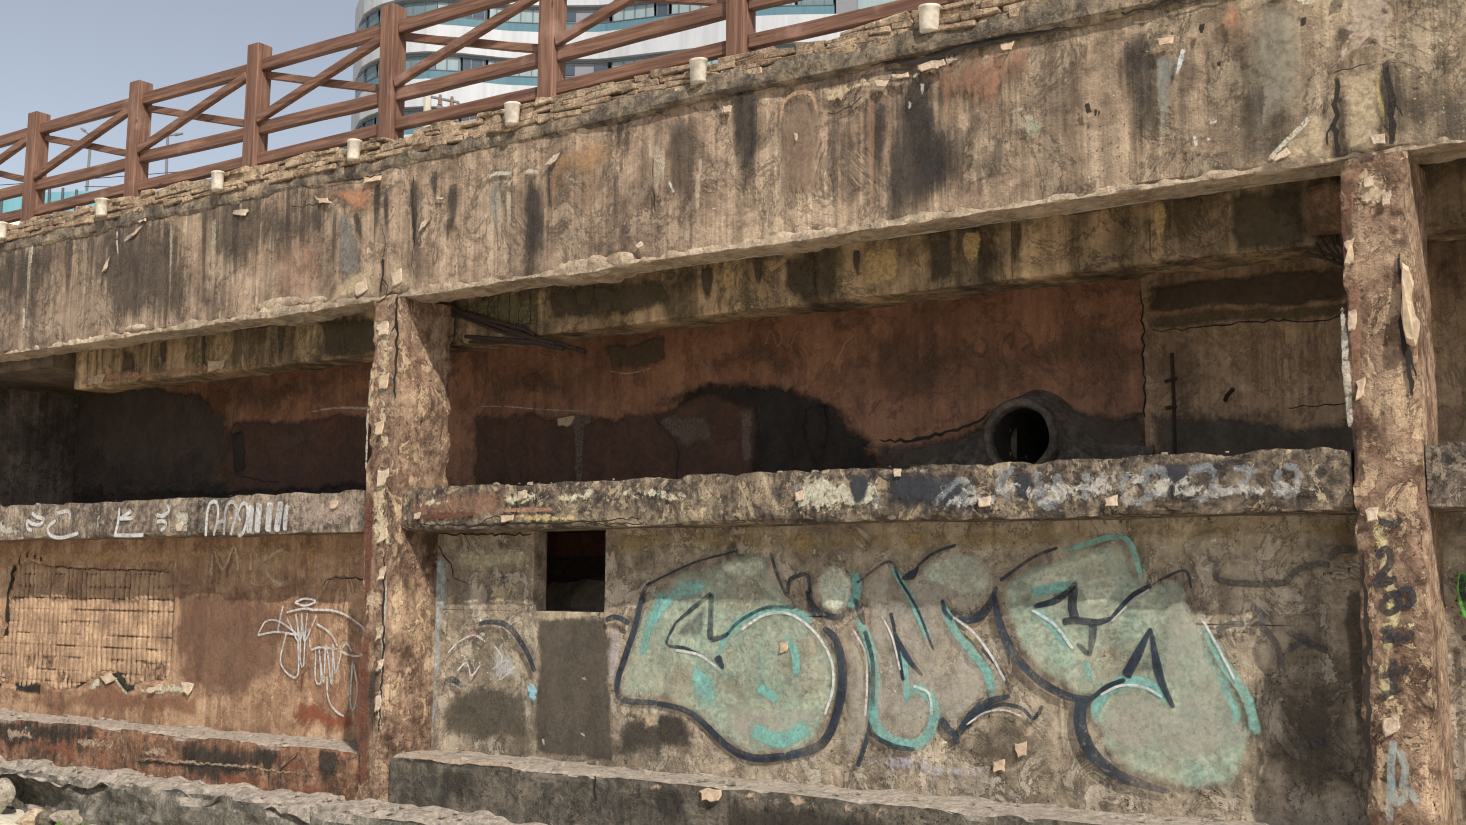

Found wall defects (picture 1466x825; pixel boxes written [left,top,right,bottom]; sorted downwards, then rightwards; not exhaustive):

leakage [669,117,697,199]
leakage [734,90,757,186]
leakage [868,78,1002,214]
leakage [1124,34,1185,145]
crack [1326,77,1341,156]
leakage [489,168,552,254]
peeling [176,511,188,531]
peeling [795,469,901,511]
peeling [941,468,1316,514]
spalling [0,552,194,695]
peeling [434,559,446,684]
peeling [1365,507,1405,737]